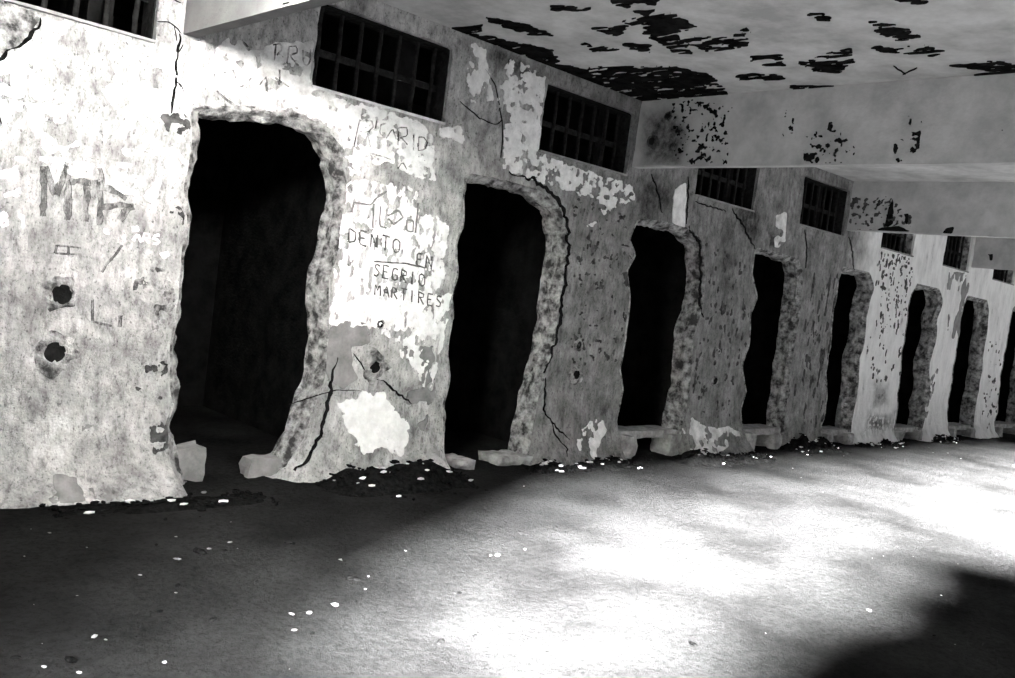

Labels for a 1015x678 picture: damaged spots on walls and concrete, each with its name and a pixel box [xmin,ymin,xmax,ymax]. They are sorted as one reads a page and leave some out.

crack [0,18,42,61]
peeling [581,0,855,90]
peeling [0,155,26,198]
crack [460,69,571,457]
spalling [90,17,1015,483]
crack [289,353,412,471]
spalling [49,474,112,504]